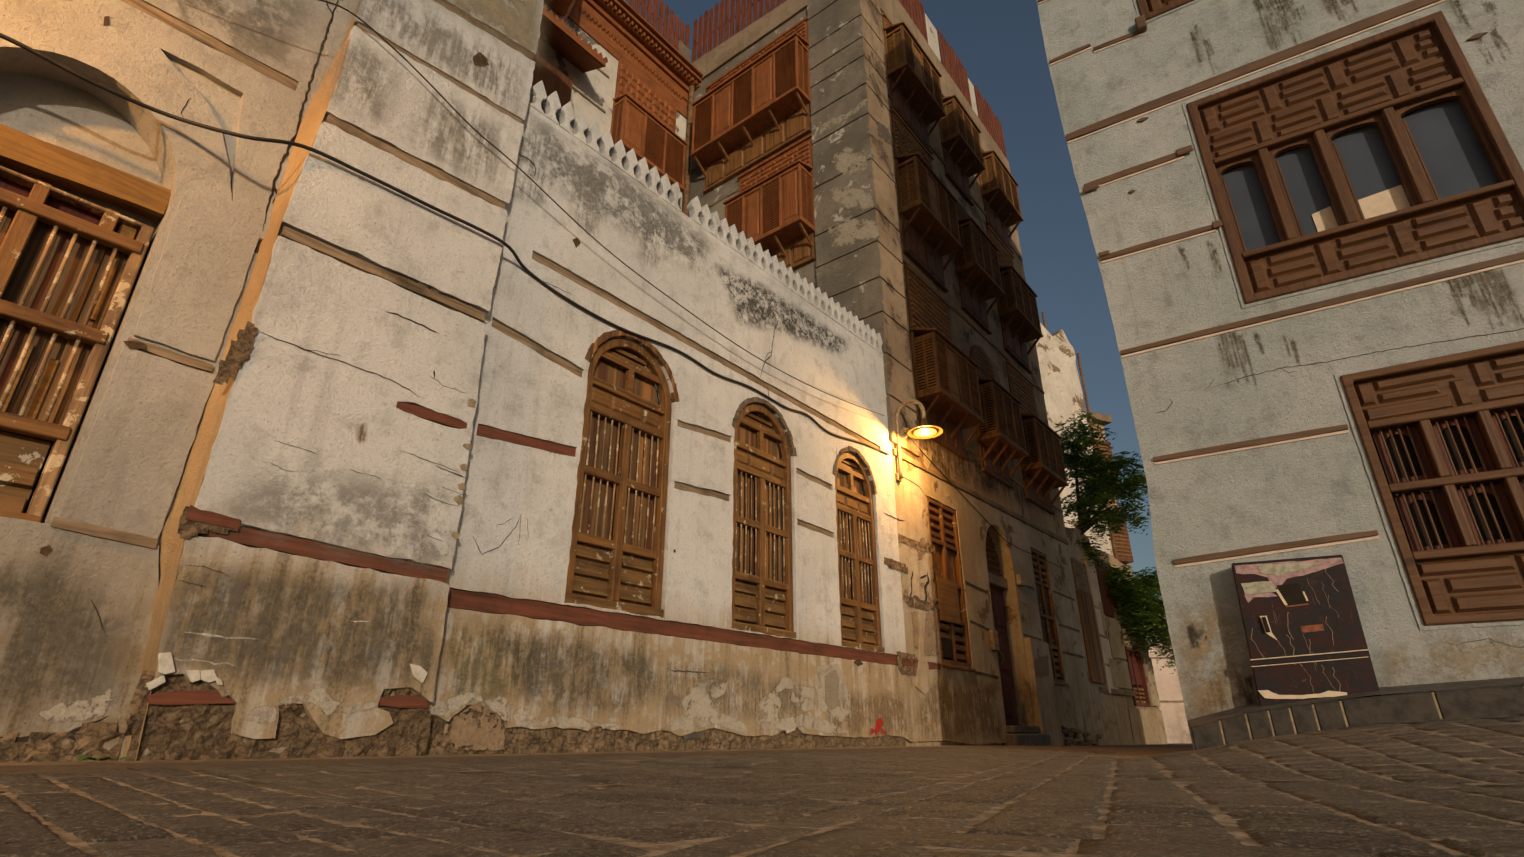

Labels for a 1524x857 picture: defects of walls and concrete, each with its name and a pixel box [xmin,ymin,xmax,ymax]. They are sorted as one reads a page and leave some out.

damp [721,269,845,352]
damp [1447,270,1524,328]
damp [1218,333,1264,384]
damp [0,576,113,723]
spalling [0,652,907,762]
damp [433,631,801,729]
damp [835,684,999,734]